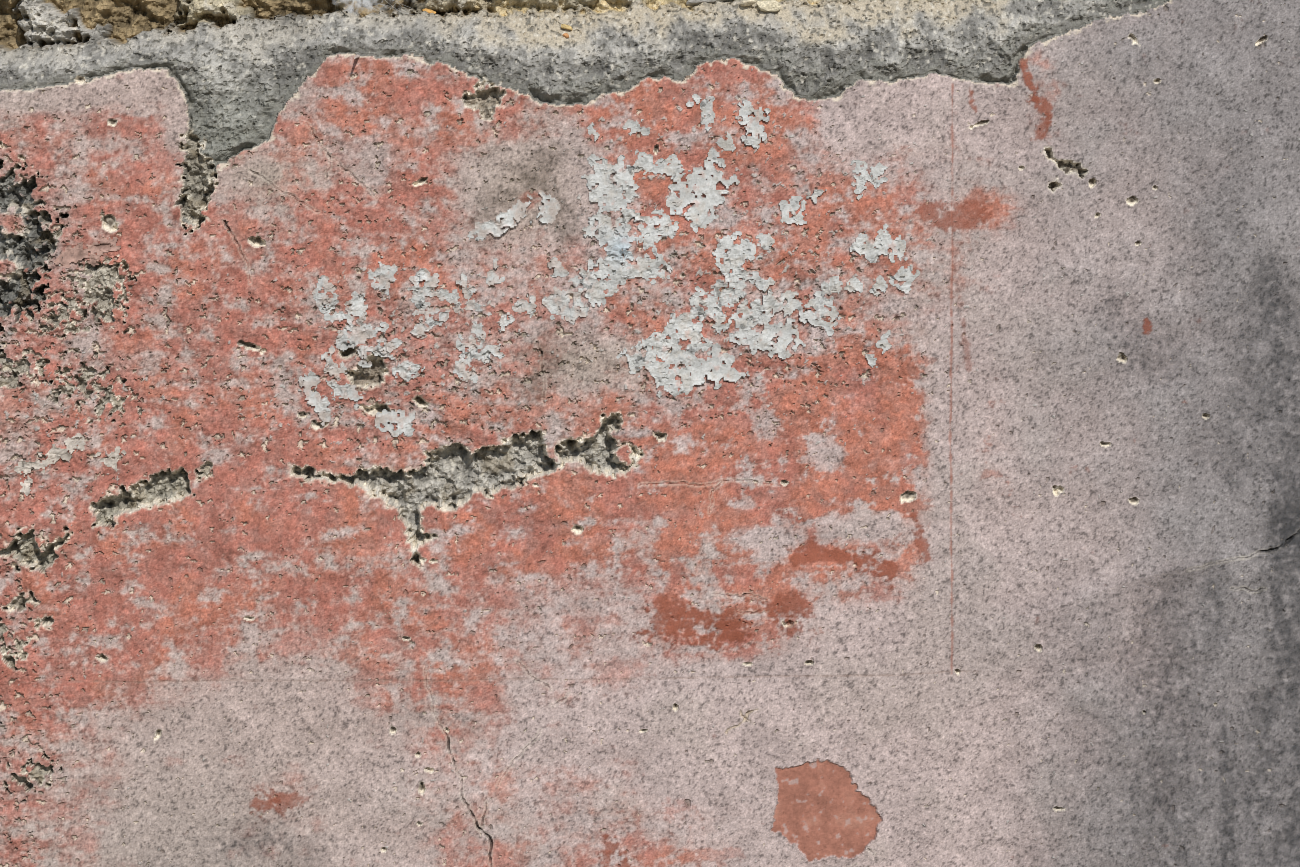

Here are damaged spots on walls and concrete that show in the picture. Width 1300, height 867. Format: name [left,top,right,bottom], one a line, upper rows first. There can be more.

spalling [462,77,506,121]
spalling [175,130,219,236]
spalling [247,236,266,248]
peeling [297,94,920,437]
spalling [0,140,213,529]
spalling [289,411,645,566]
spalling [899,490,918,505]
spalling [0,525,73,573]
crack [1187,528,1300,594]
spalling [0,591,54,672]
spalling [3,751,62,803]
crack [423,668,495,867]